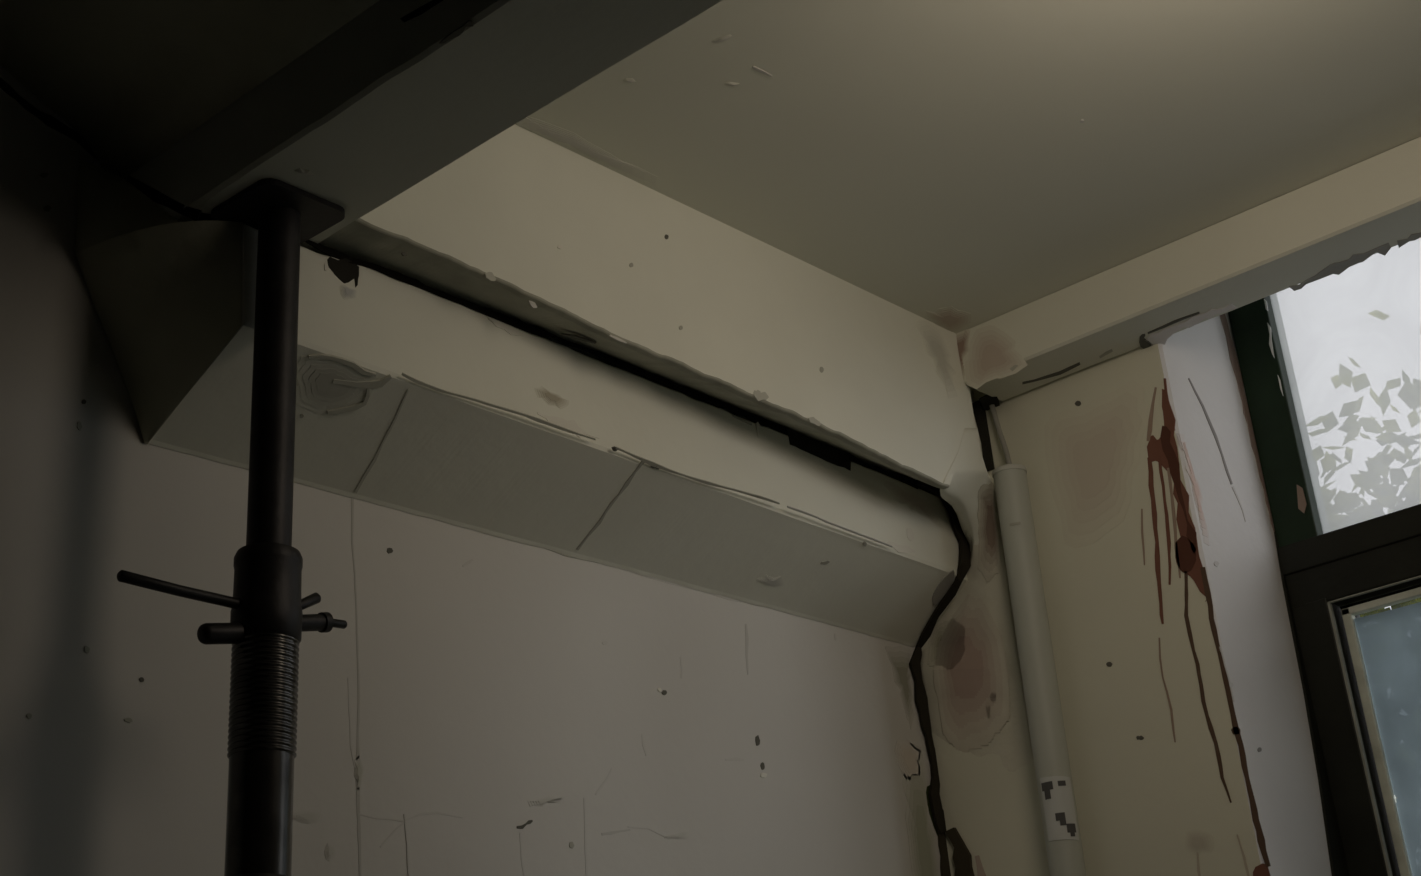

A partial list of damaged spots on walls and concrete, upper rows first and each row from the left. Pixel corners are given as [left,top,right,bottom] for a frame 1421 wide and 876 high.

crack [125,176,212,221]
damp [296,356,378,416]
crack [306,240,789,435]
corrosion [1141,378,1209,624]
corrosion [1220,314,1275,532]
peeling [1264,299,1275,358]
spalling [1289,232,1421,291]
crack [296,354,893,876]
crack [849,454,975,876]
corrosion [1237,834,1270,876]